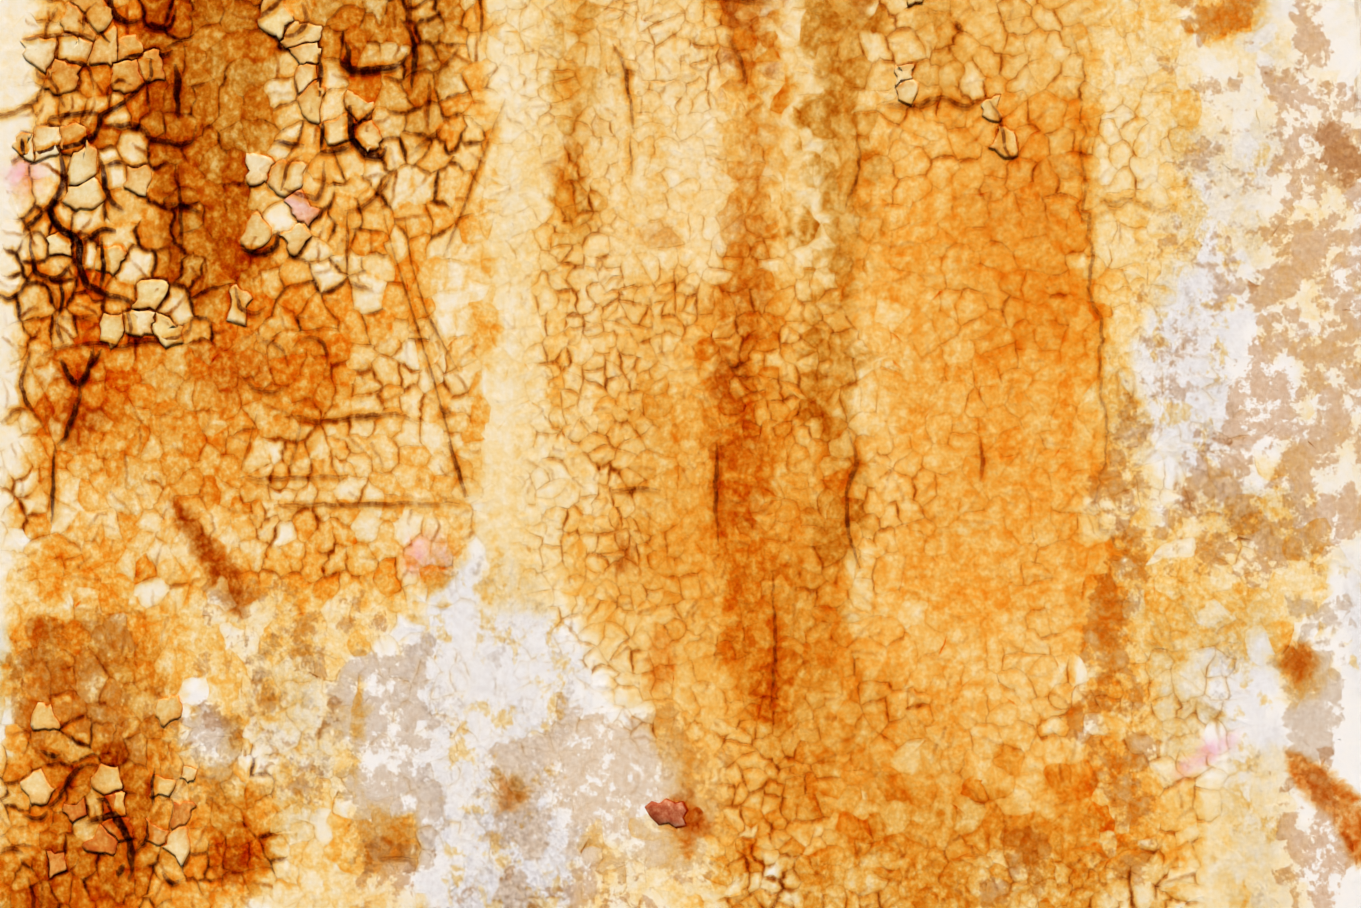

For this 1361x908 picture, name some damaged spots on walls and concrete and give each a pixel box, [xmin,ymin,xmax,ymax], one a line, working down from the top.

rust [125,0,280,286]
rust [796,53,860,138]
rust [804,0,882,49]
crack [862,0,1101,219]
crack [0,0,488,580]
crack [535,152,917,565]
spalling [178,508,240,582]
rust [96,748,151,833]
crack [0,650,284,908]
peeling [645,798,689,829]
crack [696,607,829,908]
spalling [1291,765,1361,859]